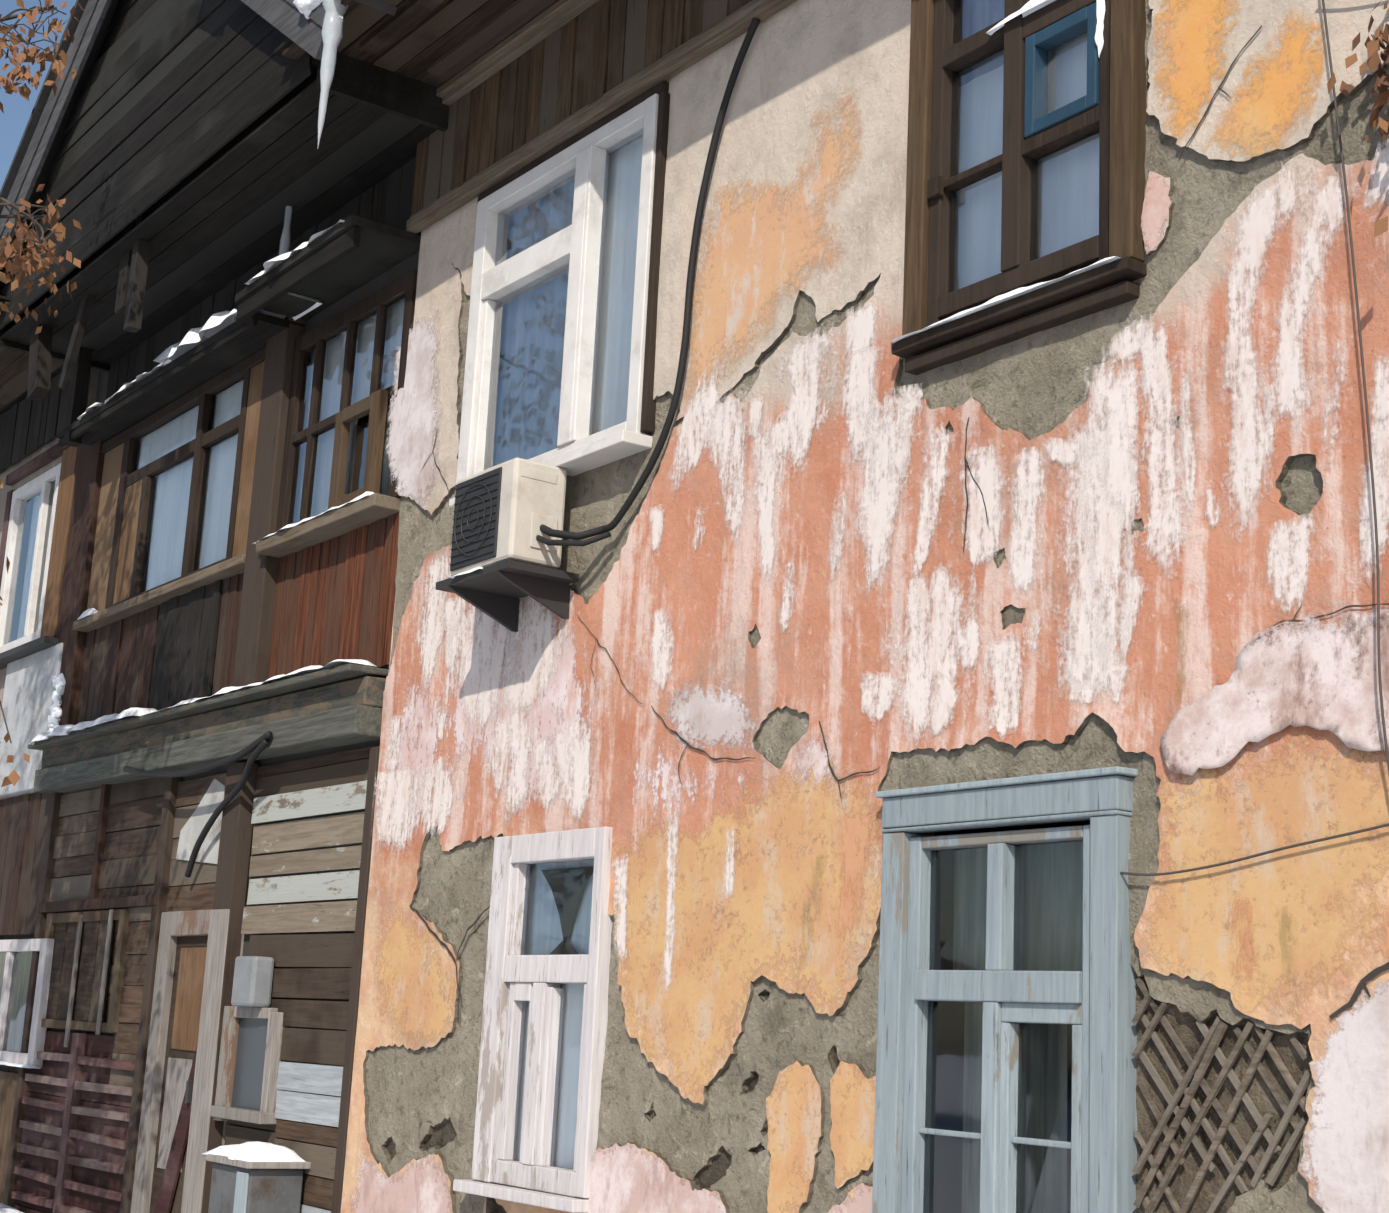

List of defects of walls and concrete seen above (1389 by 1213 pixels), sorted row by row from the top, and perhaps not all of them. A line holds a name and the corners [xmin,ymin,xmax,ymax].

peeling [557,95,881,604]
spalling [892,0,1389,440]
spalling [1275,454,1323,519]
crack [578,616,754,784]
crack [819,721,880,802]
spalling [350,825,504,1213]
peeling [587,706,1389,1213]
crack [1329,962,1389,1020]